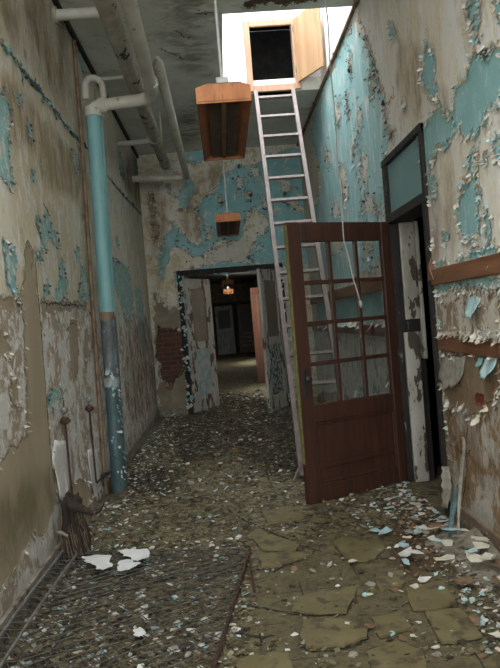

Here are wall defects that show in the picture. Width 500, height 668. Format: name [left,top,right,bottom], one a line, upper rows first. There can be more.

peeling [0,86,24,194]
peeling [0,38,89,149]
peeling [414,0,500,269]
peeling [147,8,407,416]
flaking render [433,266,500,346]
flaking render [0,213,104,590]
flaking render [437,350,500,442]
crack [228,509,341,571]
peeling [371,481,500,567]
crack [235,632,280,657]
crack [247,602,353,617]
crack [299,636,370,653]